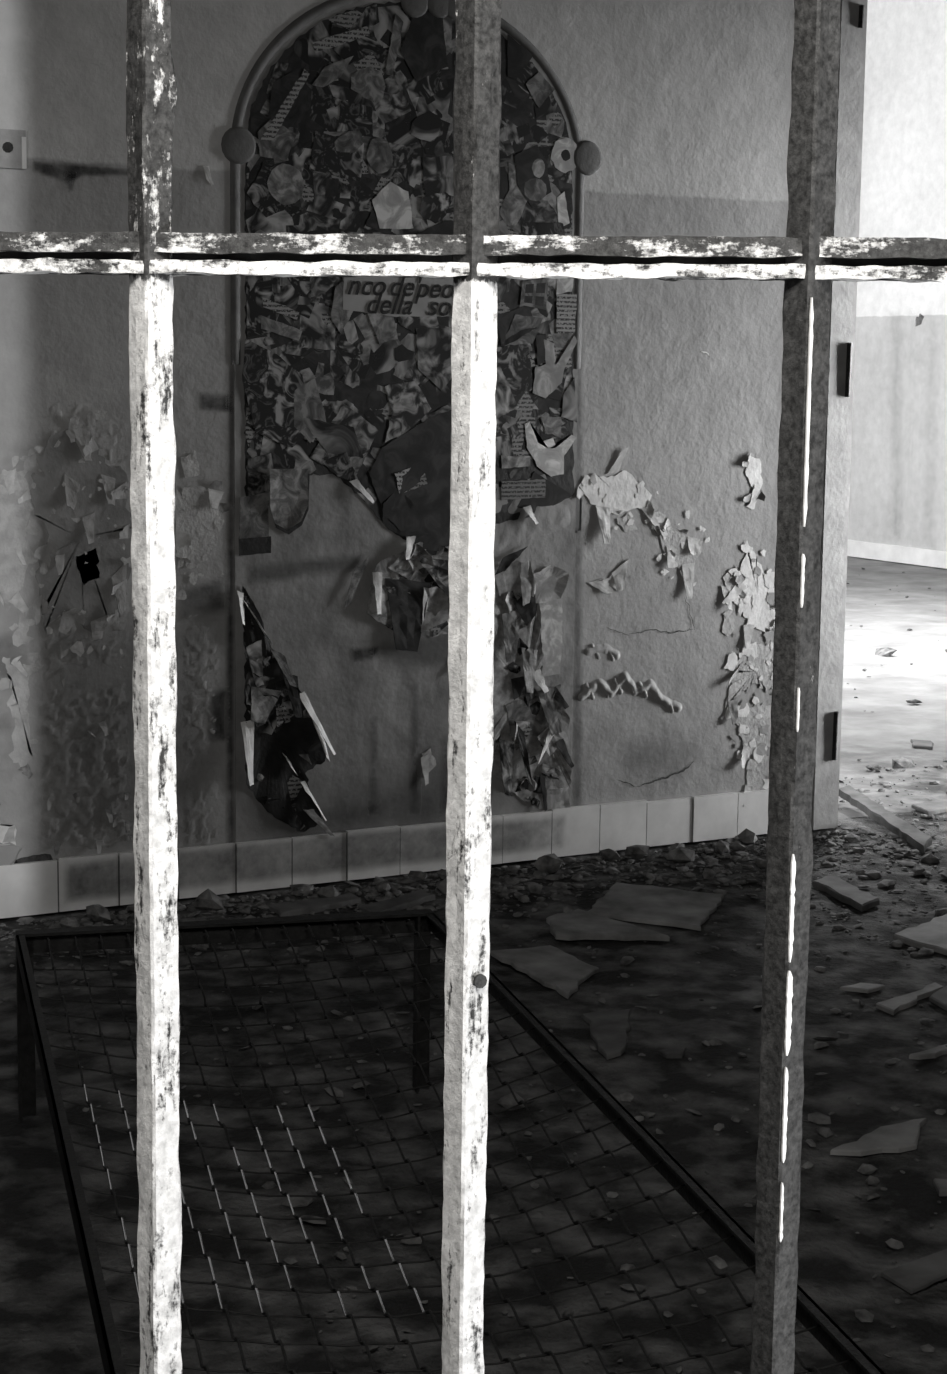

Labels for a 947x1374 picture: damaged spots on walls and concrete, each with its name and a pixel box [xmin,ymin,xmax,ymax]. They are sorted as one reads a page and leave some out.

peeling [0,411,132,779]
peeling [174,450,234,600]
spalling [0,824,53,866]